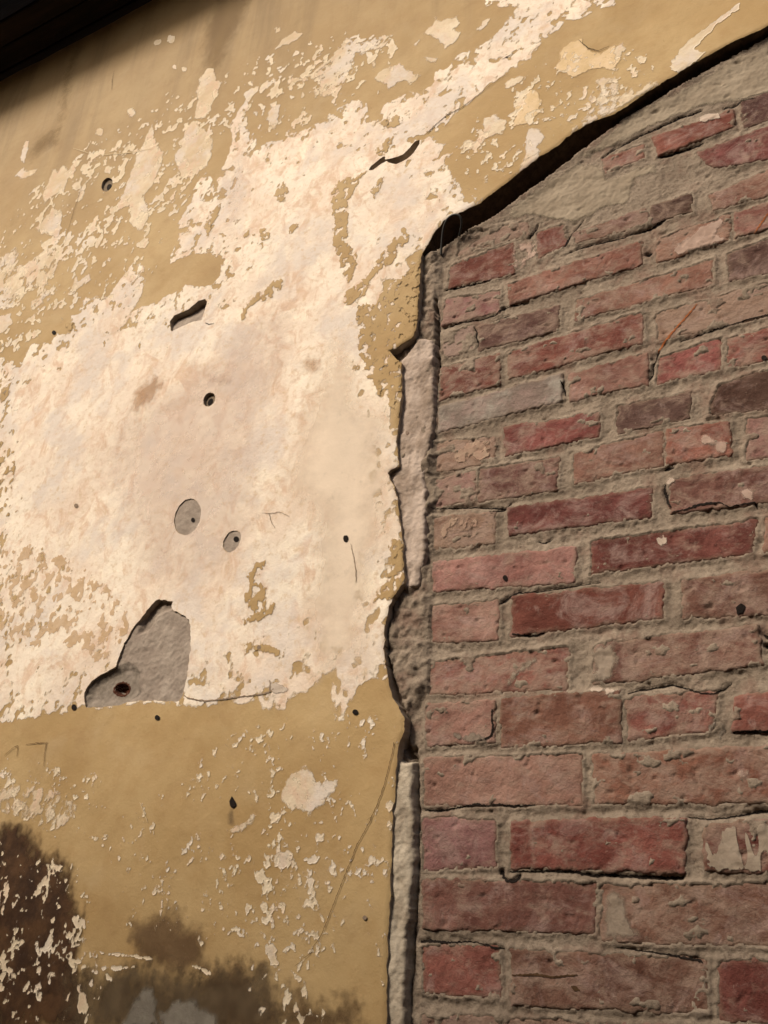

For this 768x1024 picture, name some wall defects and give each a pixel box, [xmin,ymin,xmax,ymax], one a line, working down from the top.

peeling [0,0,658,762]
peeling [0,758,106,837]
peeling [122,723,390,1024]
crack [295,742,394,966]